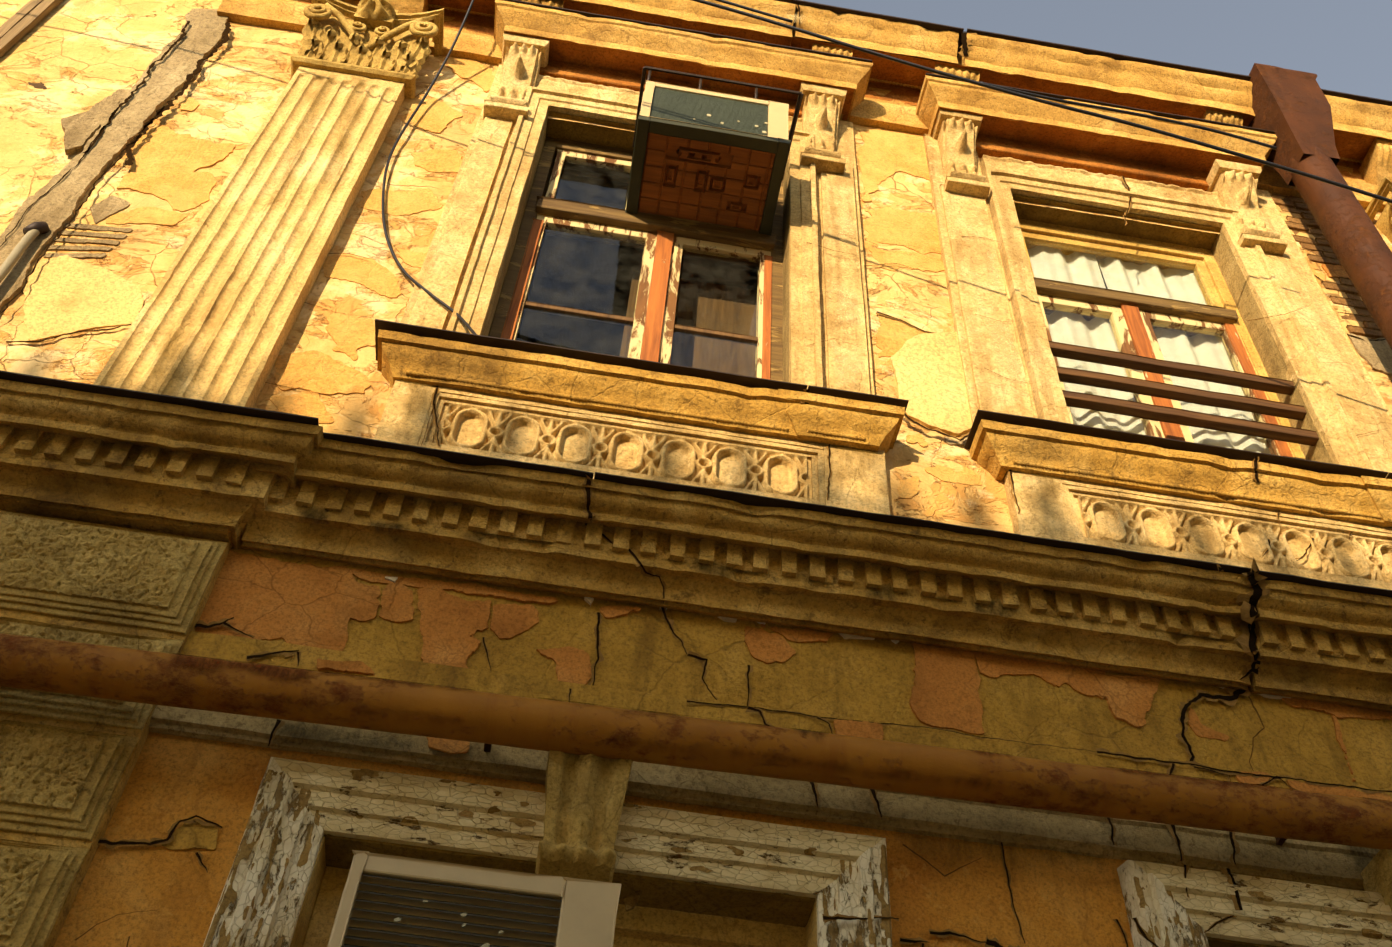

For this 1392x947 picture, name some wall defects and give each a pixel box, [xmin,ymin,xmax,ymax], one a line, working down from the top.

flaking render [23,125,235,341]
peeling [858,128,945,273]
flaking render [1272,194,1392,376]
rust [174,653,335,678]
peeling [194,550,558,675]
peeling [718,616,1162,735]
crack [576,470,1392,794]
crack [97,815,223,872]
peeling [204,769,321,947]
crack [822,842,1026,947]
crack [1113,917,1158,947]
crack [1165,824,1243,933]